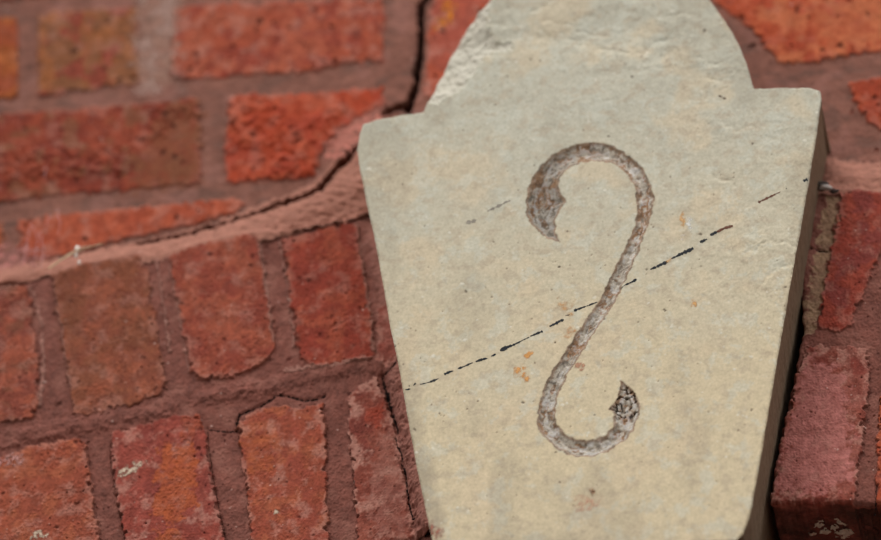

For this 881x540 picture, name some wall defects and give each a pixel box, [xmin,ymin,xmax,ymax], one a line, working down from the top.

crack [381,0,431,116]
crack [134,146,358,245]
crack [758,178,808,203]
crack [621,225,733,289]
crack [382,302,597,520]
crack [207,393,326,540]
peeling [809,518,854,539]